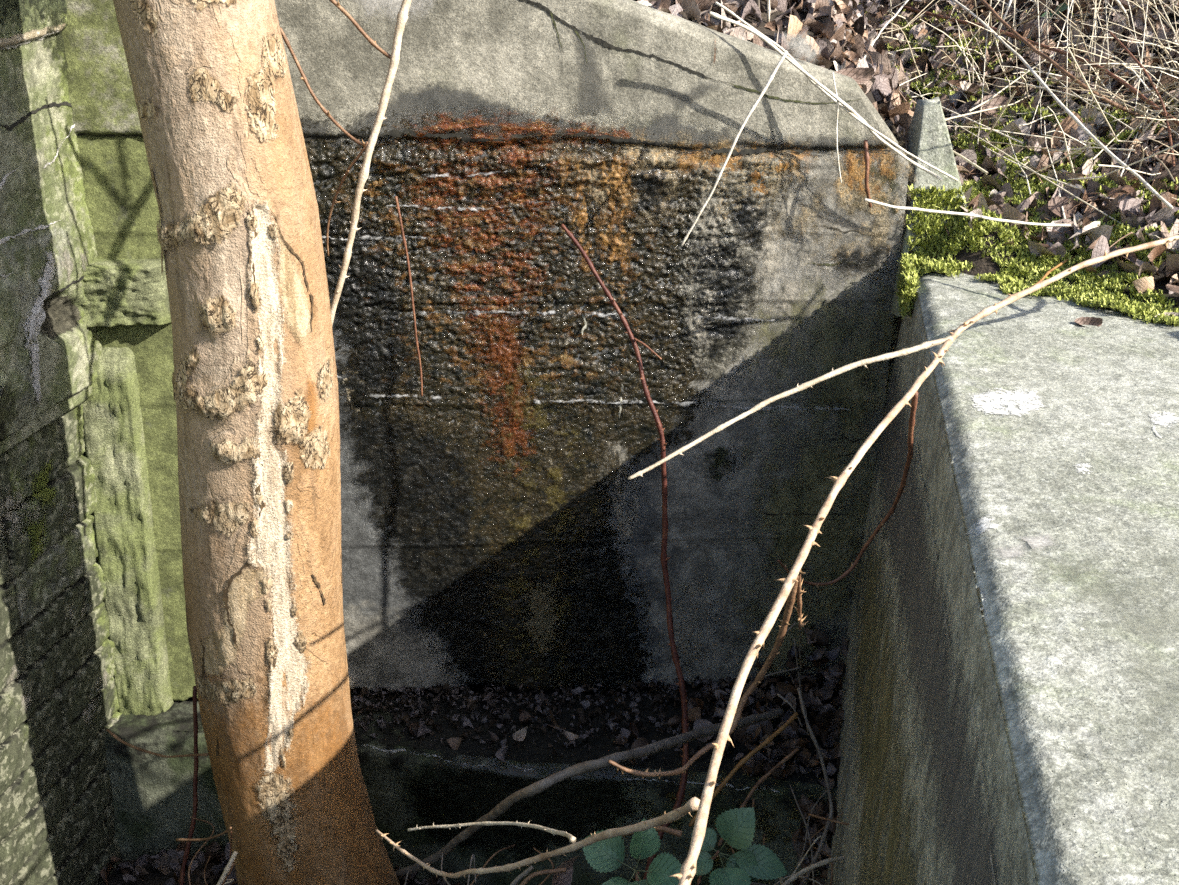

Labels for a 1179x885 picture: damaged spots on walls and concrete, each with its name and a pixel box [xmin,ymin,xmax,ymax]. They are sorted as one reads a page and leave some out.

crack [520,0,862,104]
leakage [300,28,891,694]
corrosion [412,117,913,474]